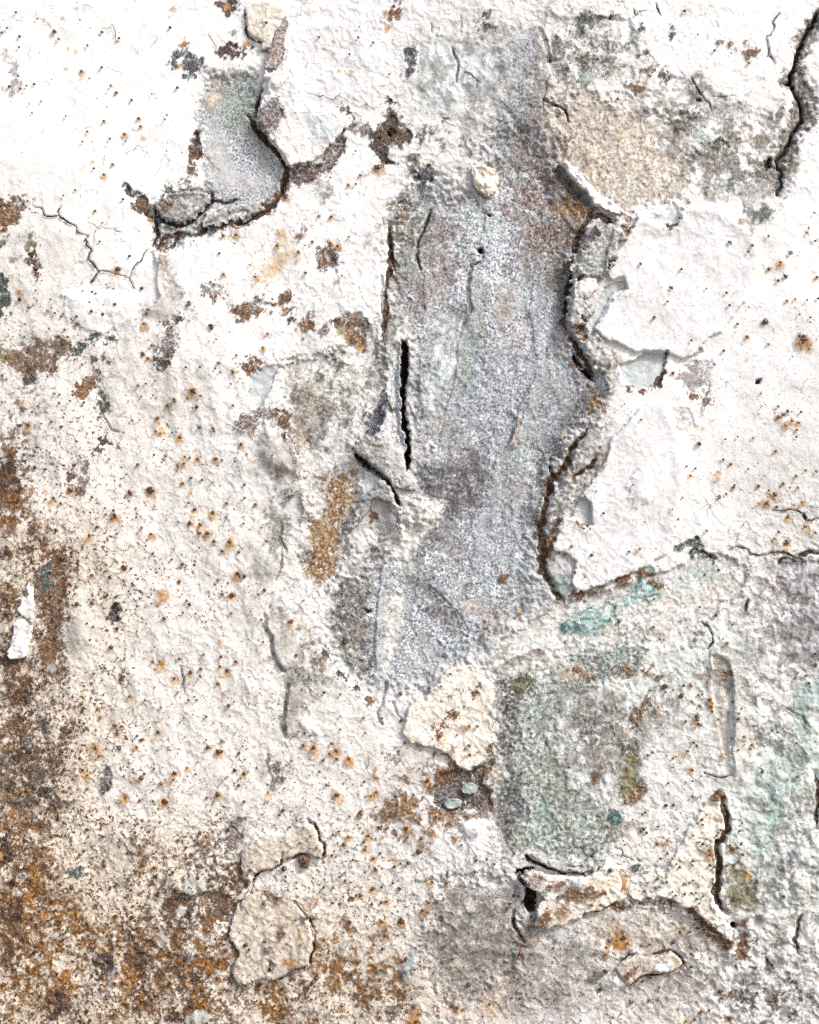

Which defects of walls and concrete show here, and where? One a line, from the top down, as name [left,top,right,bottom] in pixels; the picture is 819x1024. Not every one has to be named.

crack [35,96,289,289]
spalling [154,0,352,246]
crack [766,13,818,194]
rust [17,253,120,357]
spalling [229,10,819,998]
crack [537,427,598,600]
rust [0,374,503,1024]
leakage [552,659,683,784]